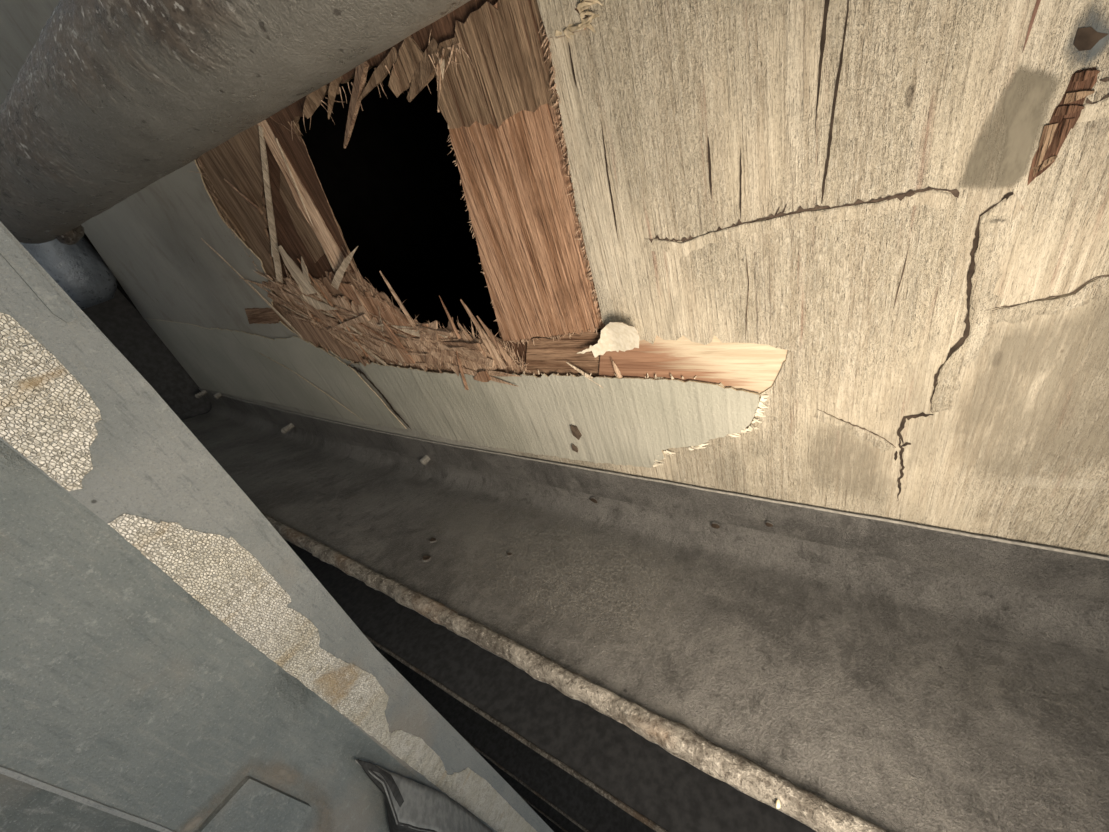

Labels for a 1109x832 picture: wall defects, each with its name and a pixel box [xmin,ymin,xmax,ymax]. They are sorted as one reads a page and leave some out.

spalling [190,0,788,394]
crack [644,187,960,257]
crack [814,192,1109,500]
crack [1076,78,1109,123]